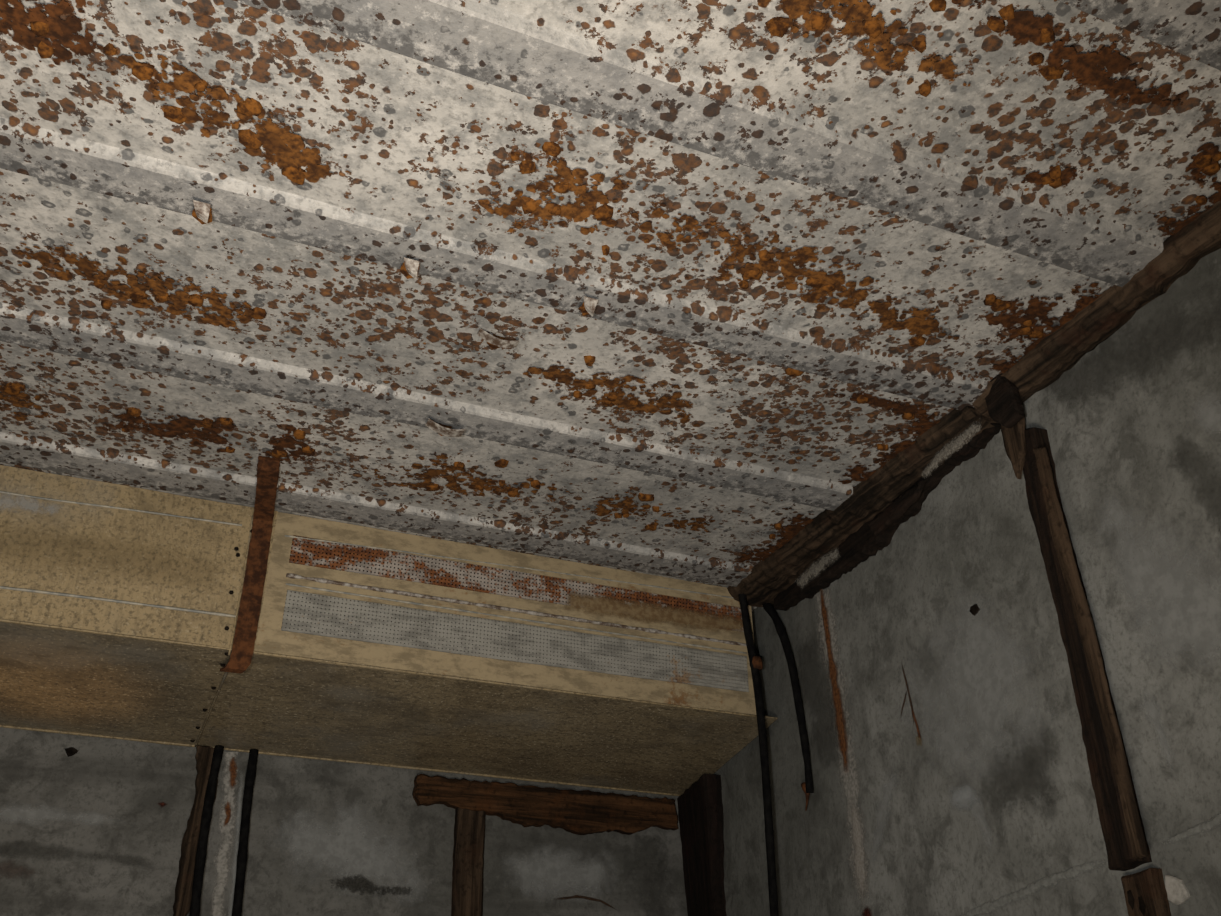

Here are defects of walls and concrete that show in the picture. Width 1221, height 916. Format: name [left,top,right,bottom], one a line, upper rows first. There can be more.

rust [0,0,351,185]
rust [748,0,970,97]
rust [929,0,1187,116]
rust [1021,165,1091,189]
rust [1146,143,1221,237]
rust [12,237,290,333]
rust [473,142,973,354]
rust [959,279,1102,375]
rust [95,407,236,460]
rust [523,355,702,430]
rust [785,368,940,488]
rust [349,446,716,539]